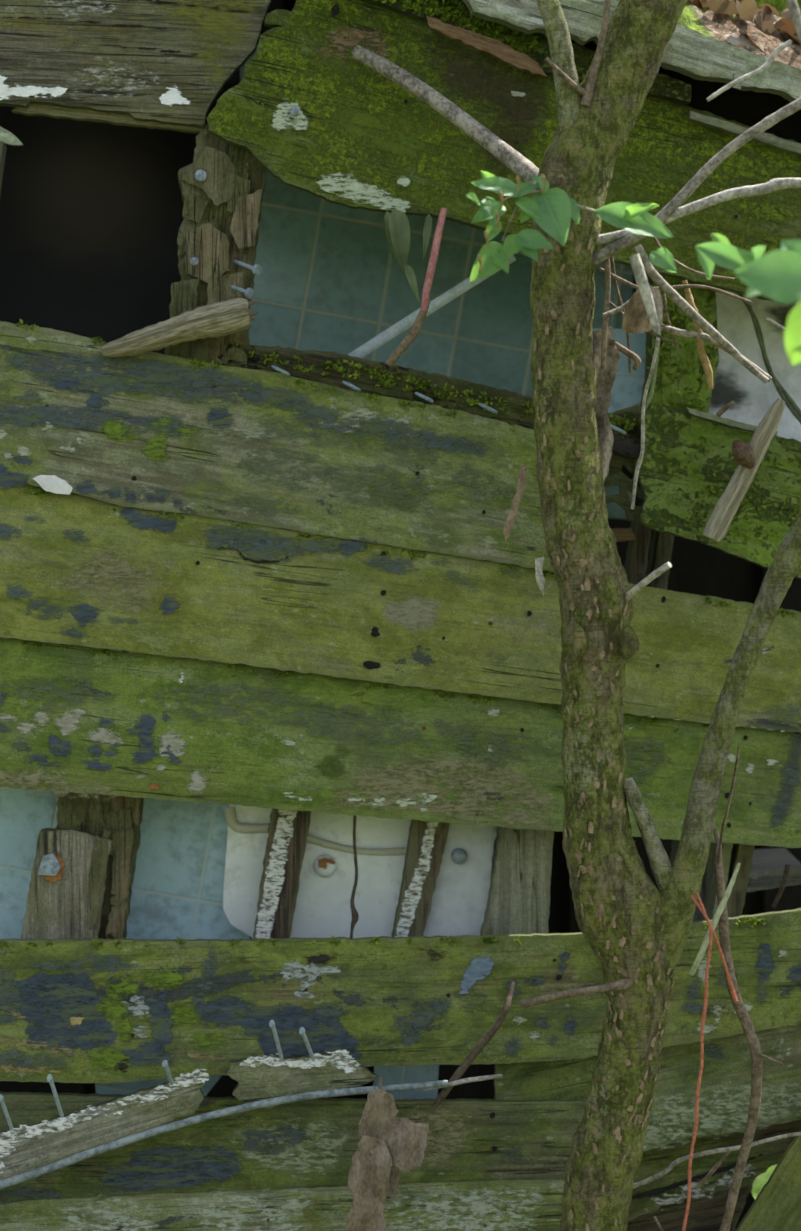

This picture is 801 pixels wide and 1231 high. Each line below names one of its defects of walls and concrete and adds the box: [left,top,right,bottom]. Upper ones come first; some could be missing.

peeling [49,0,114,17]
peeling [0,68,190,105]
corrosion [44,853,65,883]
corrosion [318,858,335,869]